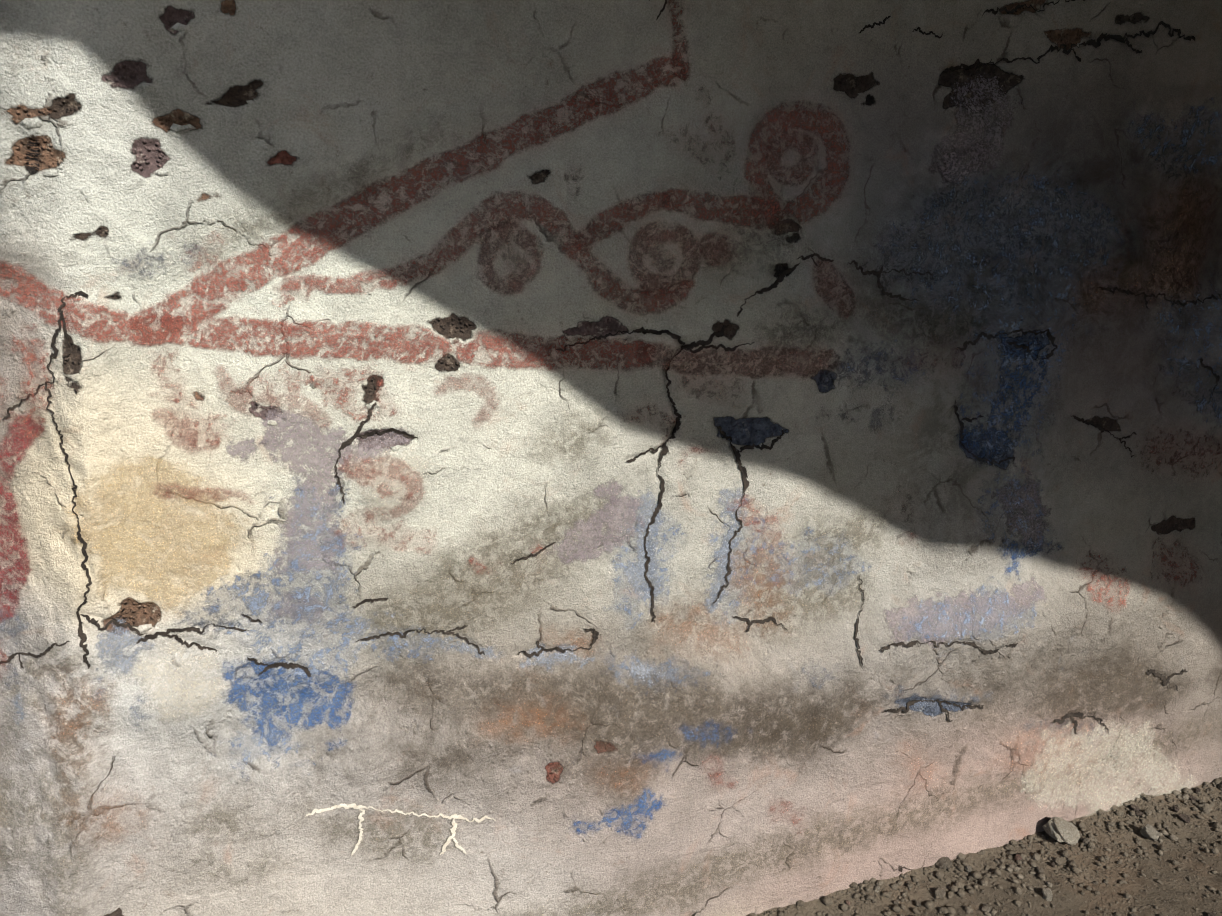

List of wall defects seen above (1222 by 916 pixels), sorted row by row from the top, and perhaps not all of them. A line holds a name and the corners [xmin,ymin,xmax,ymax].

spalling [101,59,155,92]
spalling [206,79,264,107]
spalling [5,93,82,177]
spalling [130,109,203,178]
crack [555,253,934,632]
crack [0,291,311,677]
water stain [705,489,872,637]
spalling [102,597,161,635]
water stain [521,646,593,671]
crack [518,628,599,658]
crack [854,576,1018,669]
crack [305,803,496,856]